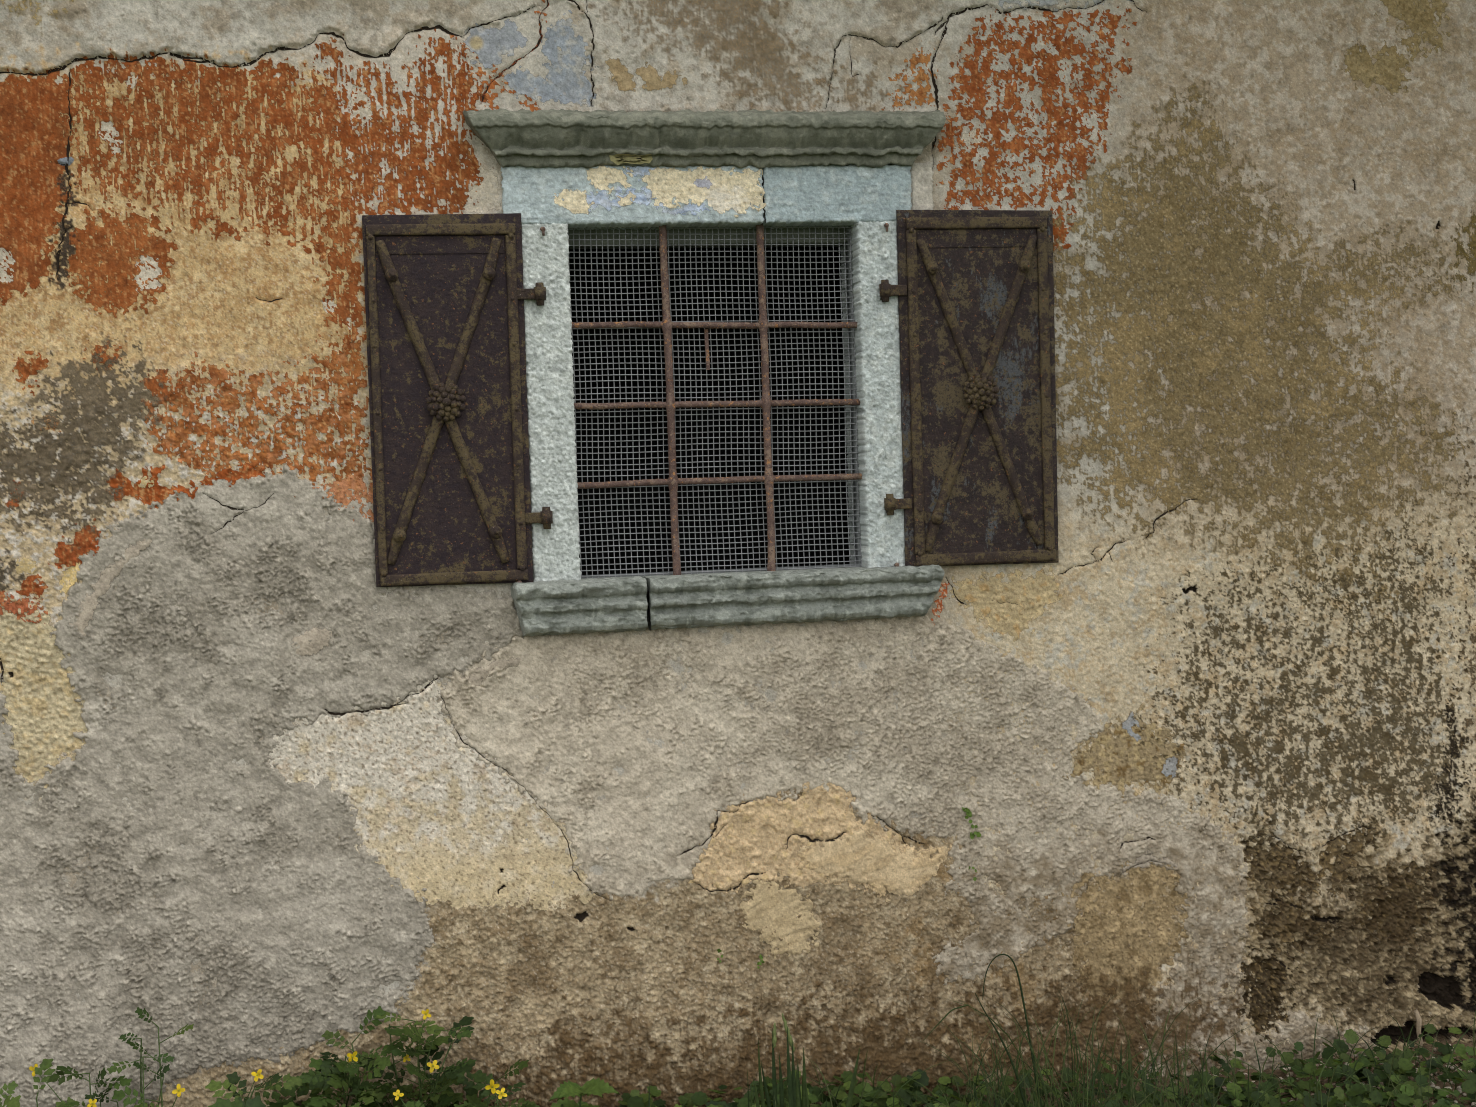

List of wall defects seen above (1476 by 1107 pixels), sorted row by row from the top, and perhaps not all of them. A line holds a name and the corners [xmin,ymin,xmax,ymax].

crack [0,0,595,279]
peeling [0,0,688,522]
peeling [554,154,766,219]
crack [825,0,1147,170]
peeling [882,0,1137,251]
crack [1060,499,1197,574]
water stain [1053,73,1476,1038]
crack [324,678,611,901]
spalling [687,780,952,902]